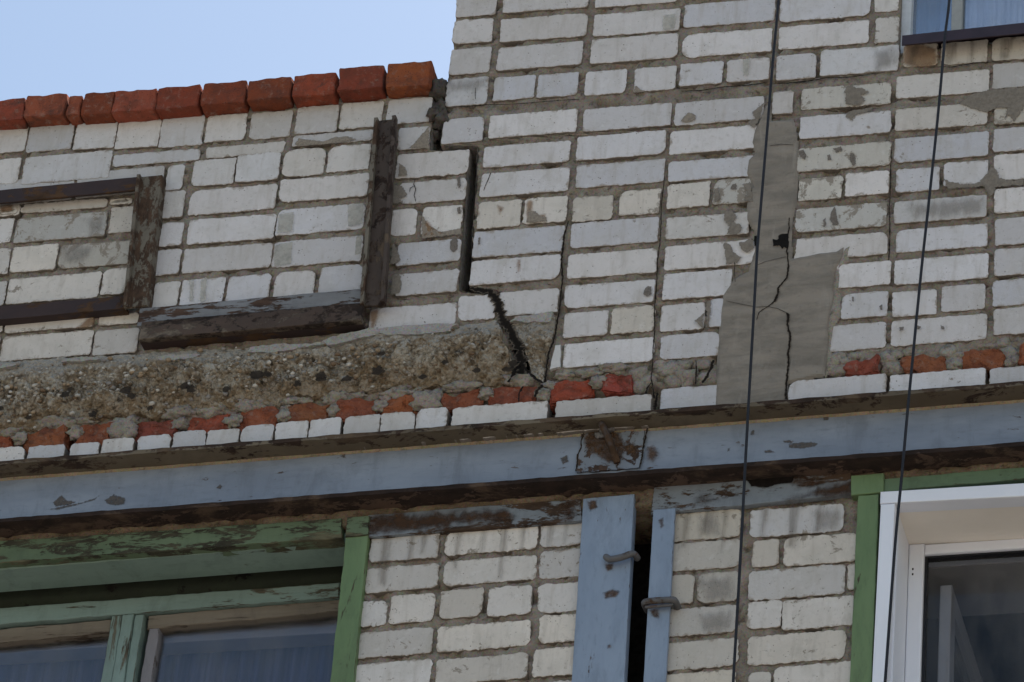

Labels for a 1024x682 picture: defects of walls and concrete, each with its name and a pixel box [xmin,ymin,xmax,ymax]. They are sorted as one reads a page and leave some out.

spalling [0,311,562,436]
crack [431,124,569,407]
crack [729,217,792,399]
peeling [53,495,125,510]